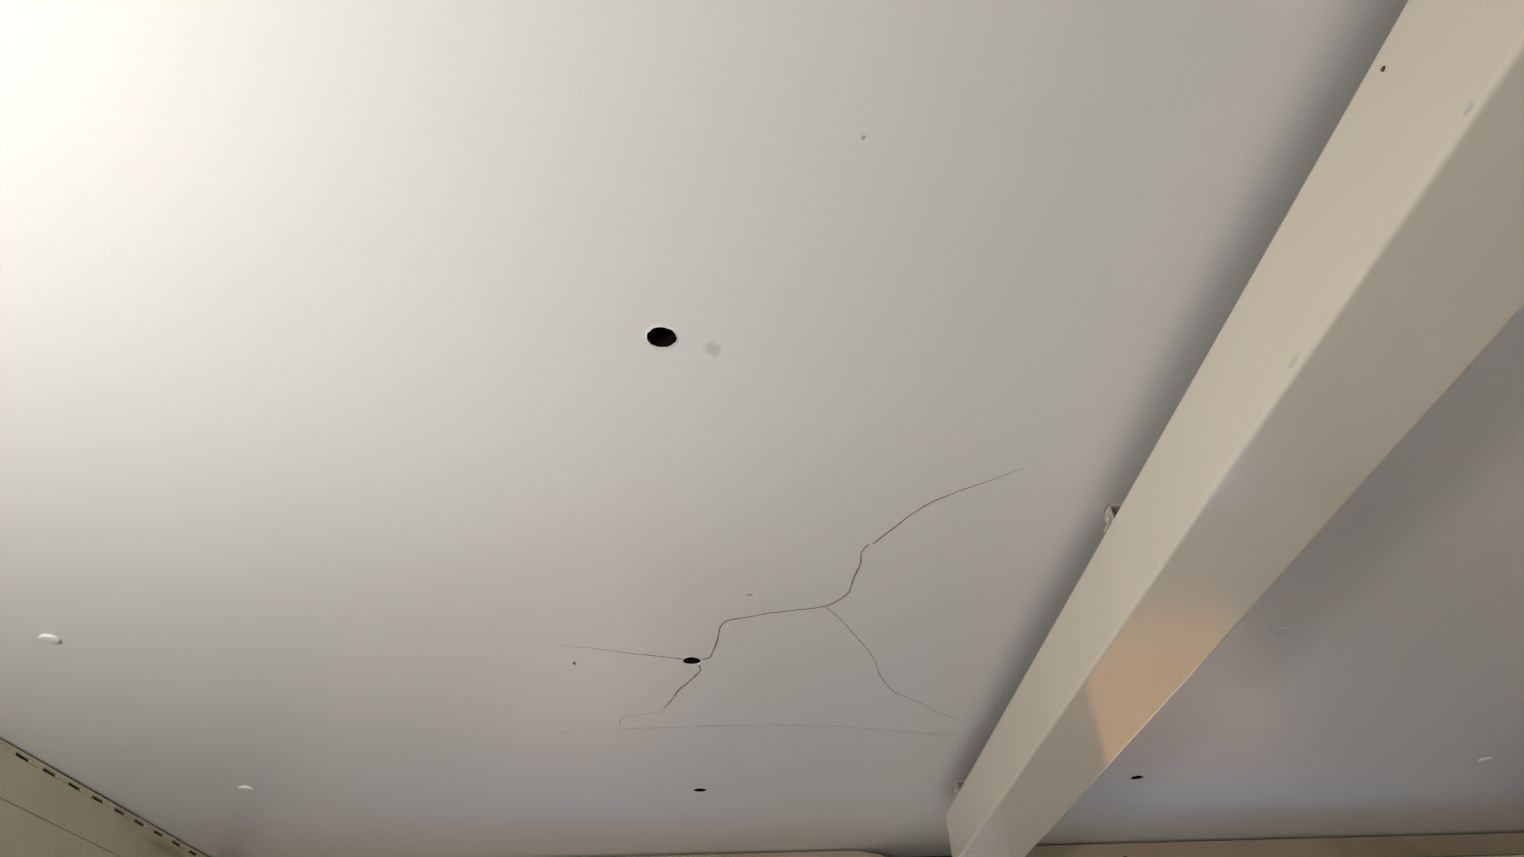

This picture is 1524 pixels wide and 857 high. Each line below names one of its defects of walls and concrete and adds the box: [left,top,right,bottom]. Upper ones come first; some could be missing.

crack [553,469,1021,735]